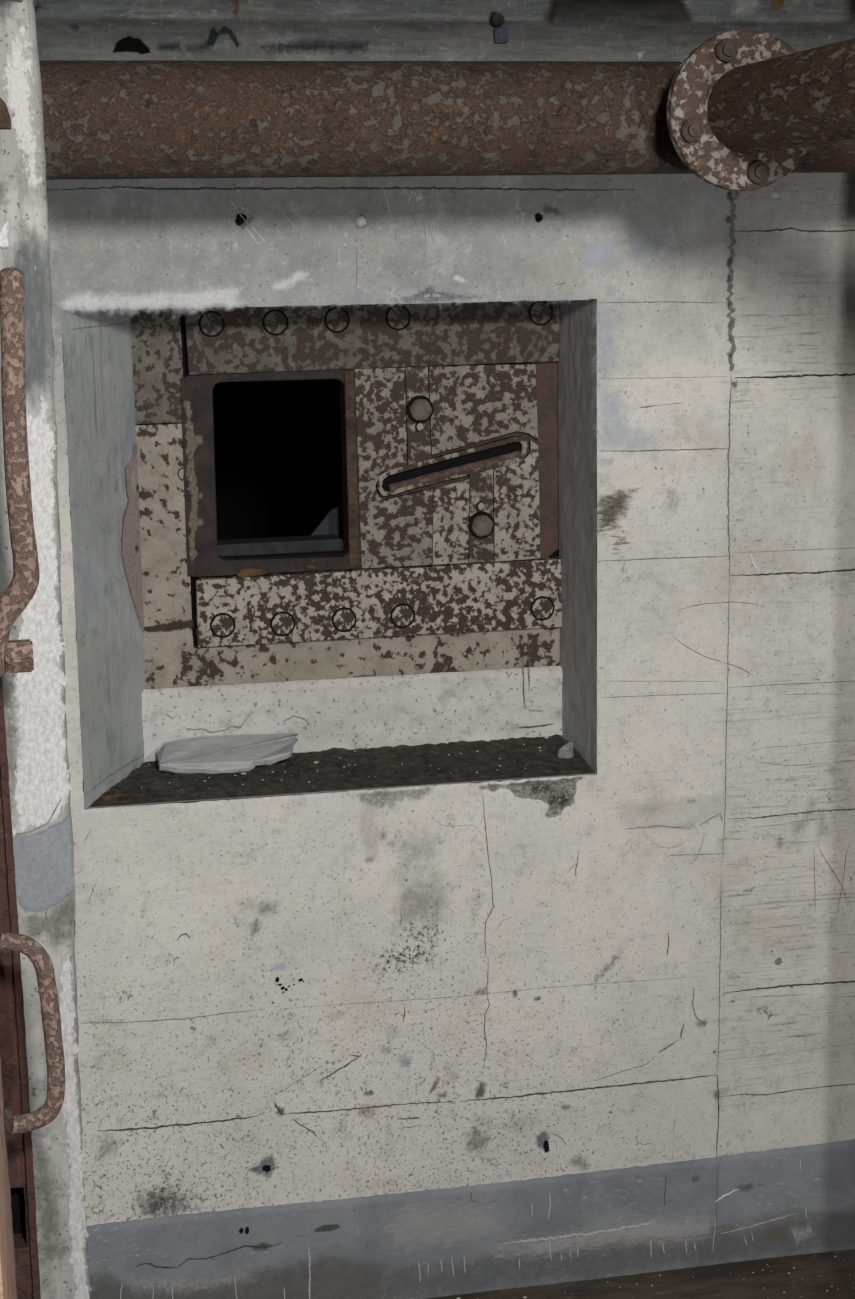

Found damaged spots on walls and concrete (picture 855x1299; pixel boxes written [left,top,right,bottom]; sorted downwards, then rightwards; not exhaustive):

corrosion [144,620,194,632]
spalling [475,744,583,817]
crack [430,793,513,1067]
crack [135,1242,283,1269]